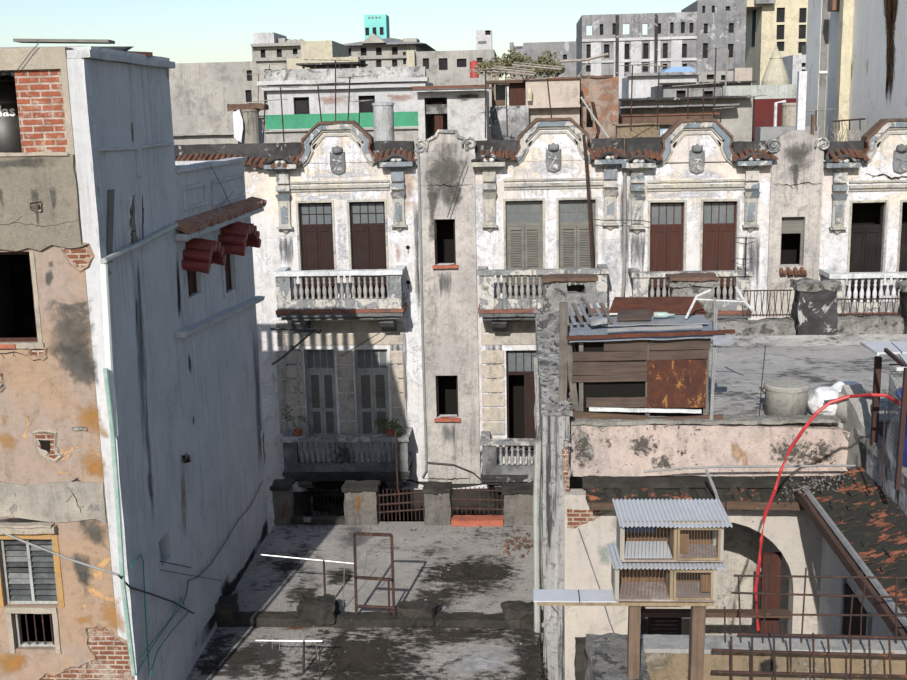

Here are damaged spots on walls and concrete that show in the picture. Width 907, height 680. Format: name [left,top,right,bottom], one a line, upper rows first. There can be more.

corrosion [884,0,898,98]
leakage [428,145,461,239]
crack [866,173,907,183]
flaking render [60,242,95,273]
leakage [52,303,95,383]
spalling [32,430,64,463]
leakage [574,434,594,467]
leakage [629,436,673,469]
flaking render [38,623,135,680]